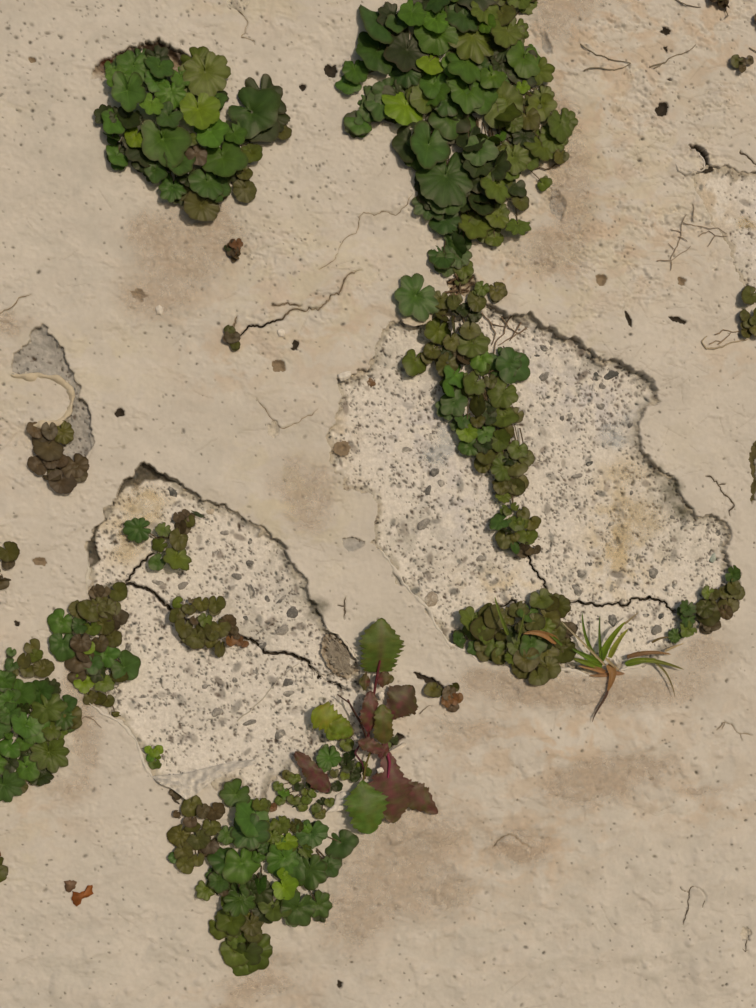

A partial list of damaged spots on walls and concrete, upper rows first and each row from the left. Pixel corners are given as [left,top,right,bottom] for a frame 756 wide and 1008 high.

spalling [226,0,249,14]
spalling [675,147,756,292]
crack [233,195,412,336]
spalling [11,324,95,461]
spalling [326,305,731,677]
crack [126,553,189,621]
spalling [85,463,384,800]
crack [228,634,346,690]
crack [528,555,547,588]
crack [571,596,676,611]
spalling [327,791,349,812]